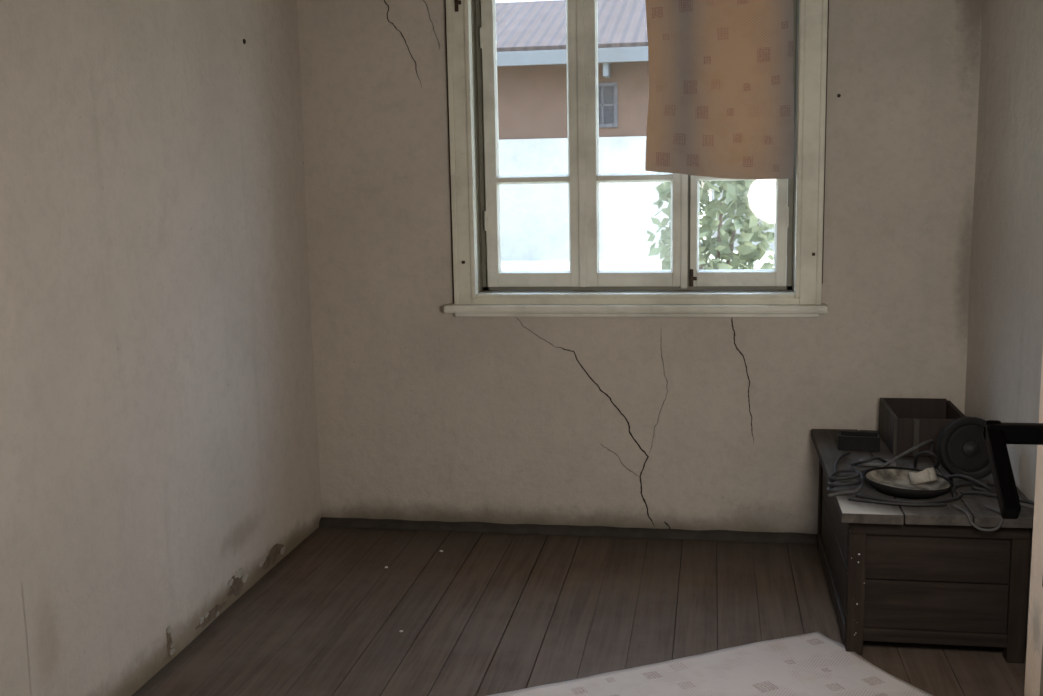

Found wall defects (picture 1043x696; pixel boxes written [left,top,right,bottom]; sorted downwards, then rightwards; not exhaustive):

crack [384,0,421,83]
crack [517,318,670,529]
crack [731,319,754,440]